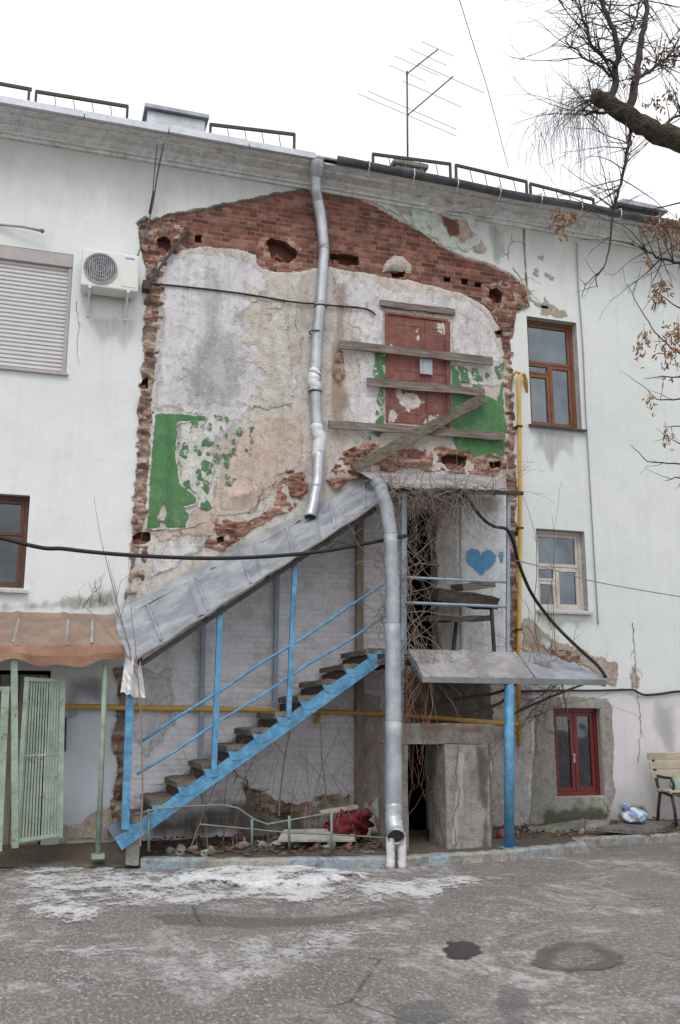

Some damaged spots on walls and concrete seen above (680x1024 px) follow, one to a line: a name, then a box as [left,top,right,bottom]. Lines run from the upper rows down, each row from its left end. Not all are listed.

peeling [123,189,640,689]
flaking render [59,667,126,844]
spalling [241,782,350,821]